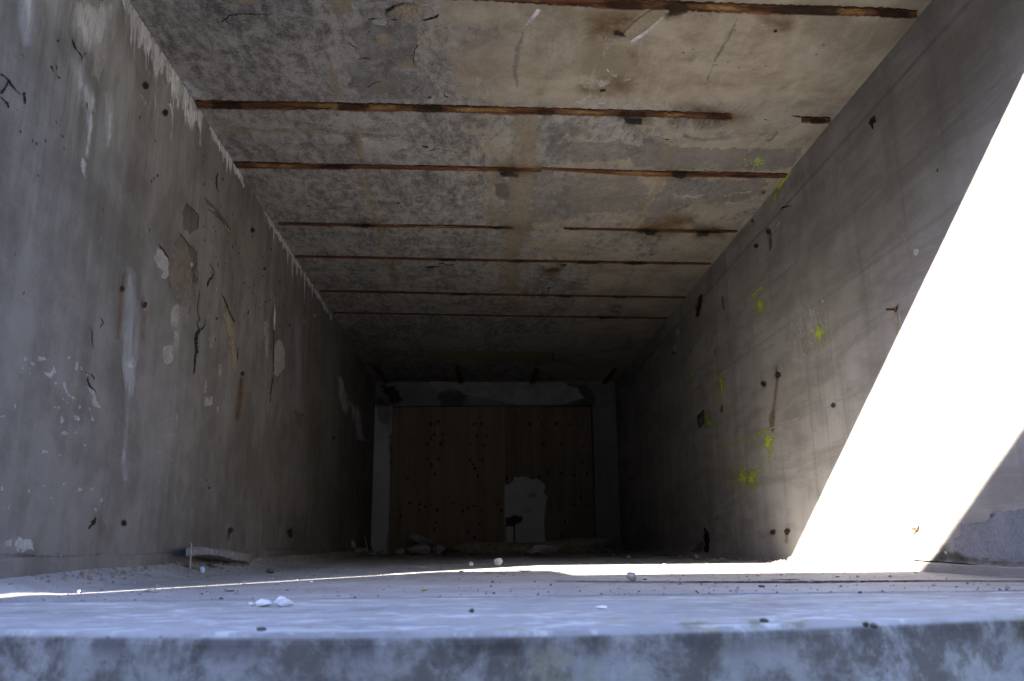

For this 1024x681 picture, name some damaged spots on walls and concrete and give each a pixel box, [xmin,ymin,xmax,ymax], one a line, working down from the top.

rust [664,0,840,32]
rust [878,10,909,19]
crack [0,74,26,111]
efflorescence [74,0,245,188]
rust [323,104,395,112]
rust [600,111,646,125]
rust [497,163,540,178]
rust [696,226,721,236]
spalling [154,203,233,364]
crack [188,264,249,375]
damp [123,275,137,399]
peeling [5,536,35,553]